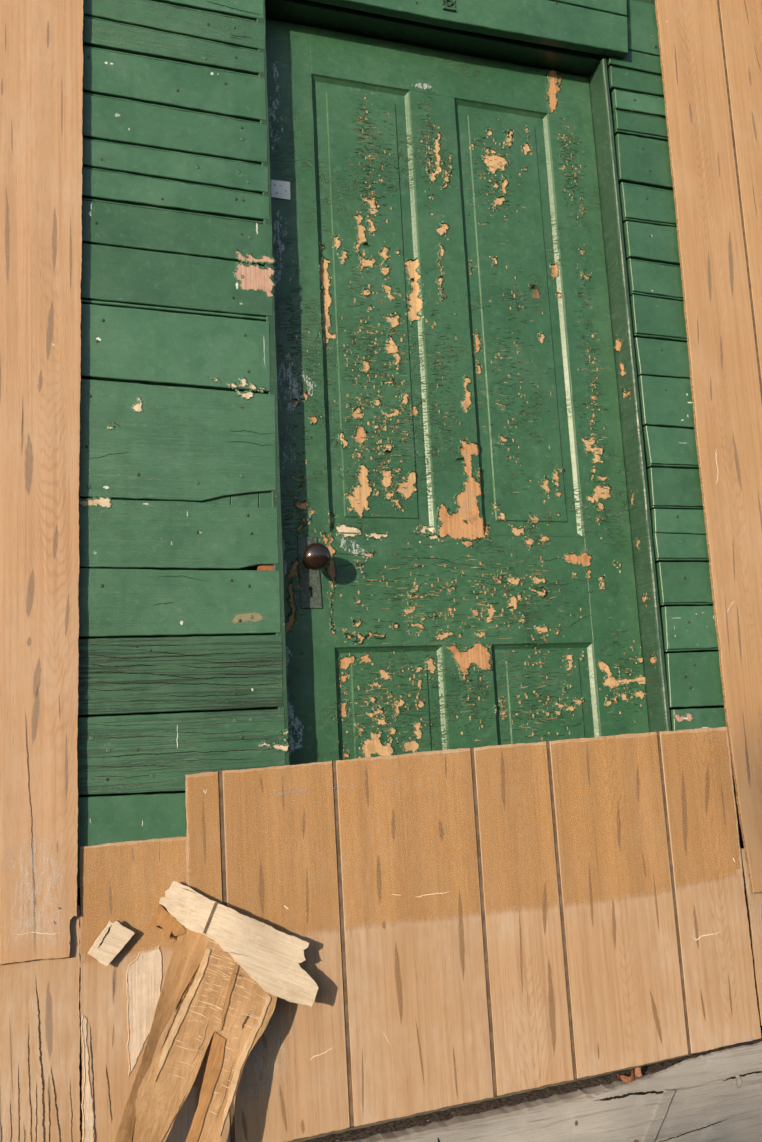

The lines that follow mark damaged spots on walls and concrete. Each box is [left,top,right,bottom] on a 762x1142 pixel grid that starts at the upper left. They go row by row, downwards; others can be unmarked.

peeling [544,68,563,114]
peeling [425,131,453,201]
peeling [469,125,533,212]
peeling [233,249,276,298]
peeling [207,376,266,401]
crack [233,77,645,758]
peeling [293,194,657,760]
crack [25,713,36,946]
crack [0,977,112,1142]
crack [594,1091,664,1101]
crack [659,1120,724,1142]
crack [723,1071,762,1081]